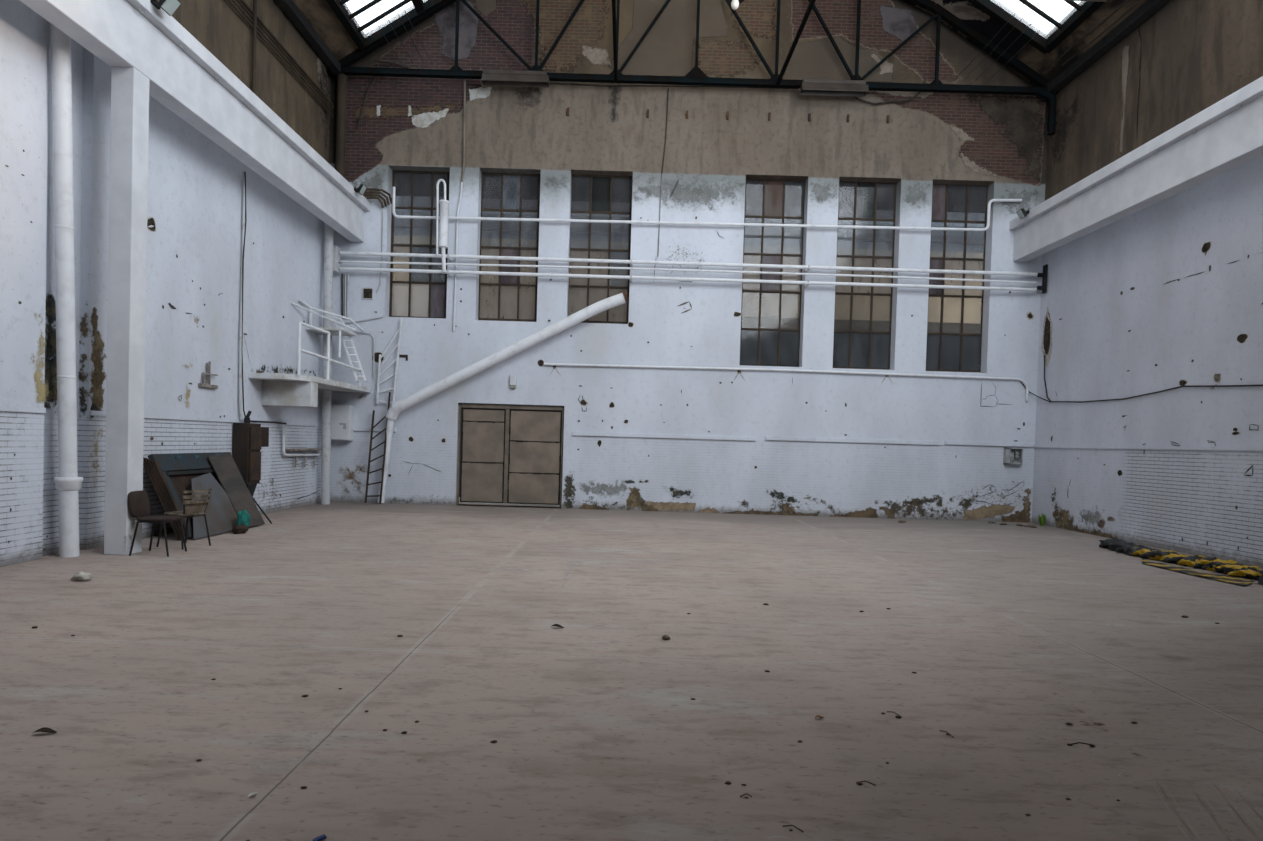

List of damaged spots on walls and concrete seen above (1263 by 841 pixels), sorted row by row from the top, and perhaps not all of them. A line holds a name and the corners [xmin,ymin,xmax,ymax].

flaking render [345,0,609,182]
flaking render [695,0,1046,186]
spalling [642,501,896,518]
spalling [912,481,1031,522]
spalling [1068,516,1118,539]